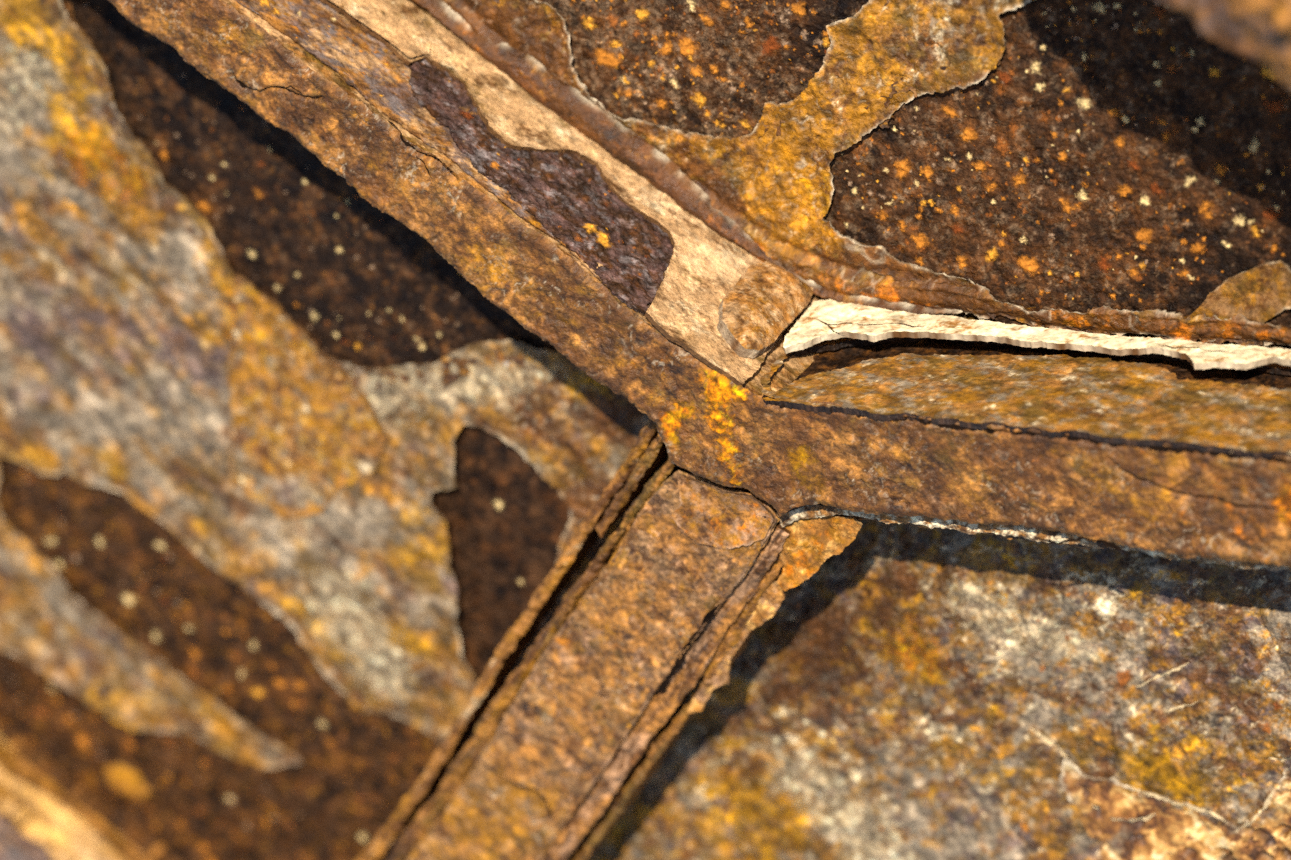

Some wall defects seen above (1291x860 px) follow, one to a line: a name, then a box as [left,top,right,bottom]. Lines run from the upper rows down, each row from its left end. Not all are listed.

peeling [0,457,441,860]
peeling [62,0,568,520]
rust [0,0,747,769]
peeling [235,0,673,315]
peeling [431,425,570,681]
peeling [535,0,893,146]
rust [788,449,808,472]
rust [442,0,1291,346]
rust [582,519,1291,860]
peeling [783,0,1291,389]
crack [1037,537,1132,558]
crack [892,417,1291,509]